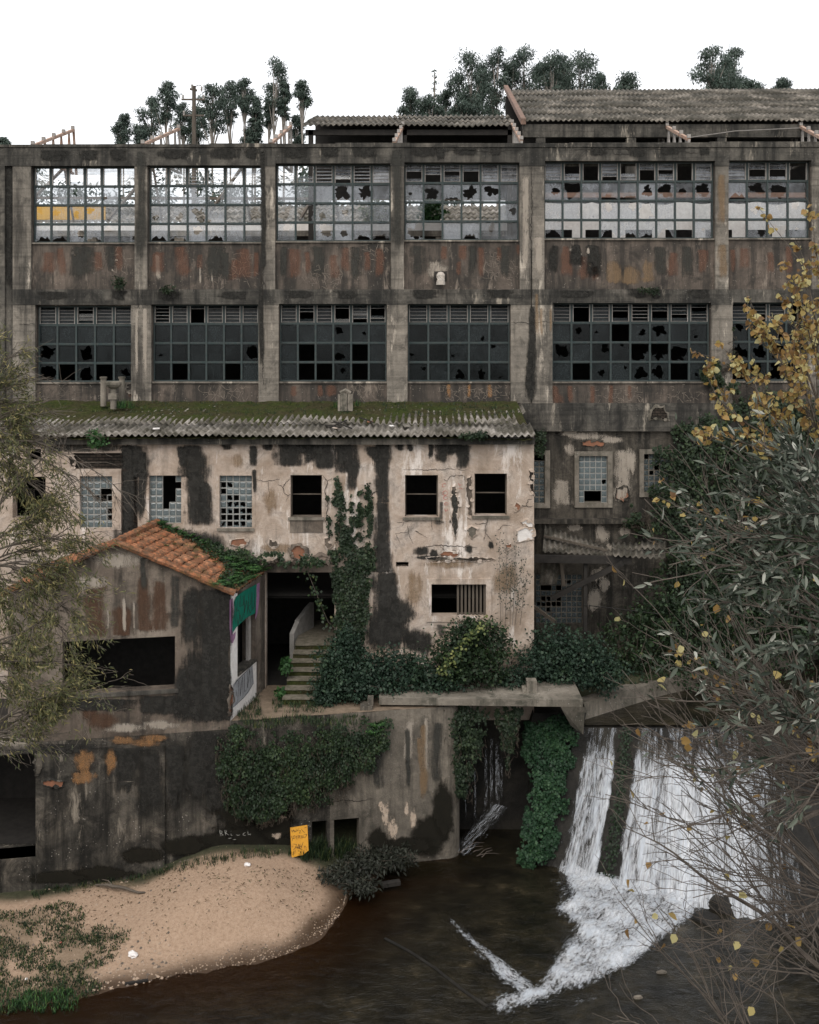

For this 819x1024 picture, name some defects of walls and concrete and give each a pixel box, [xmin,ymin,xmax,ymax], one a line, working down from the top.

leakage [522,176,601,277]
leakage [47,445,149,539]
leakage [177,445,242,557]
peeling [229,537,250,548]
leakage [221,445,446,656]
peeling [504,468,536,551]
peeling [554,480,569,504]
peeling [563,431,635,504]
leakage [0,553,293,884]
spalling [378,801,416,838]
leakage [367,718,453,858]